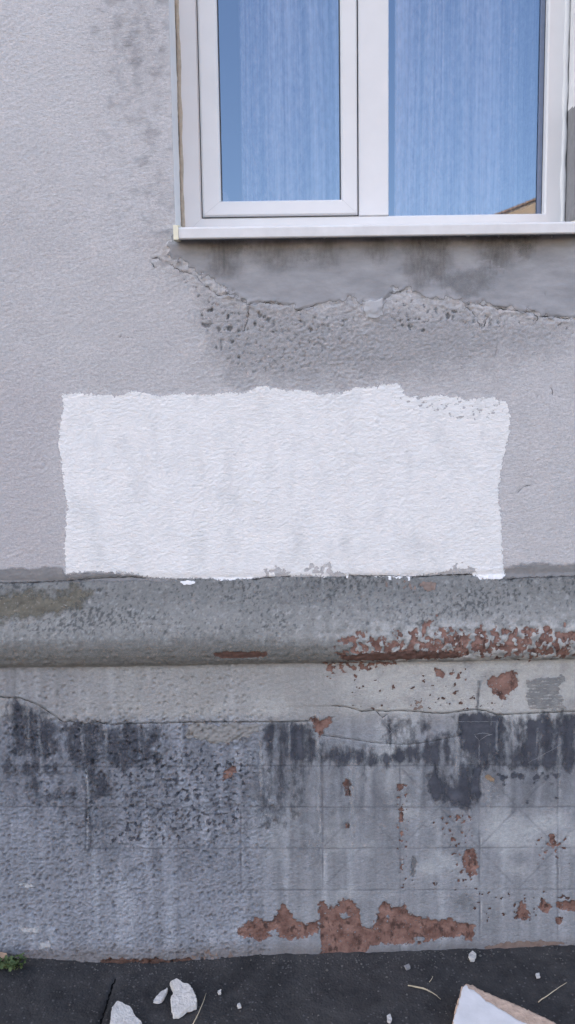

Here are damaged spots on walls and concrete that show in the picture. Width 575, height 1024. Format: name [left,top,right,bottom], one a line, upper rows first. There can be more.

peeling [213,651,267,659]
peeling [322,615,575,710]
water stain [3,689,575,850]
peeling [397,784,416,888]
peeling [433,815,575,925]
peeling [237,898,475,954]